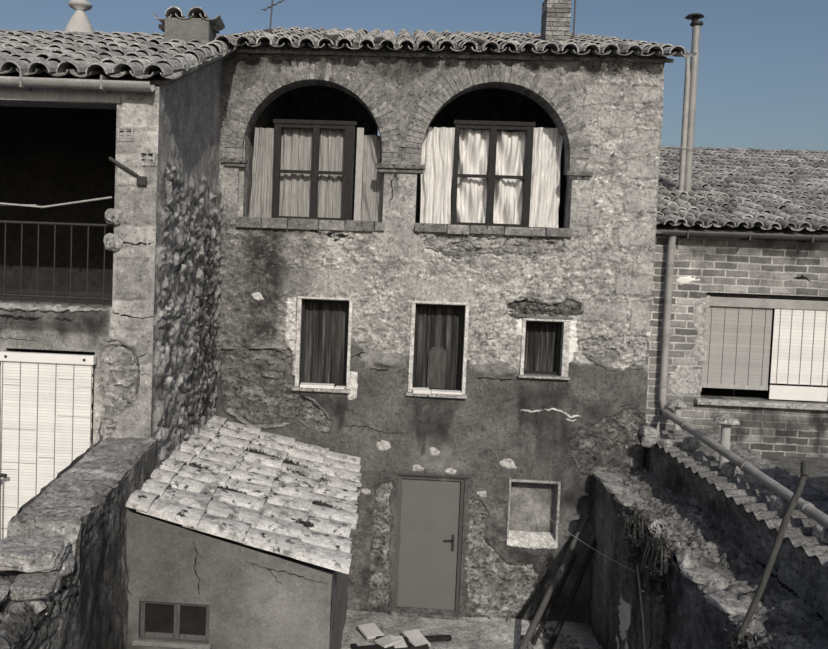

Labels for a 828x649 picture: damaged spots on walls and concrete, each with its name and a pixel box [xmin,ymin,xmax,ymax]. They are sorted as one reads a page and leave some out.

flaking render [506,295,583,322]
flaking render [97,338,140,440]
flaking render [217,346,333,435]
flaking render [520,408,647,476]
crack [193,540,203,591]
crack [246,561,327,585]
flaking render [361,481,393,607]
flaking render [464,491,540,618]
spalling [358,623,431,648]